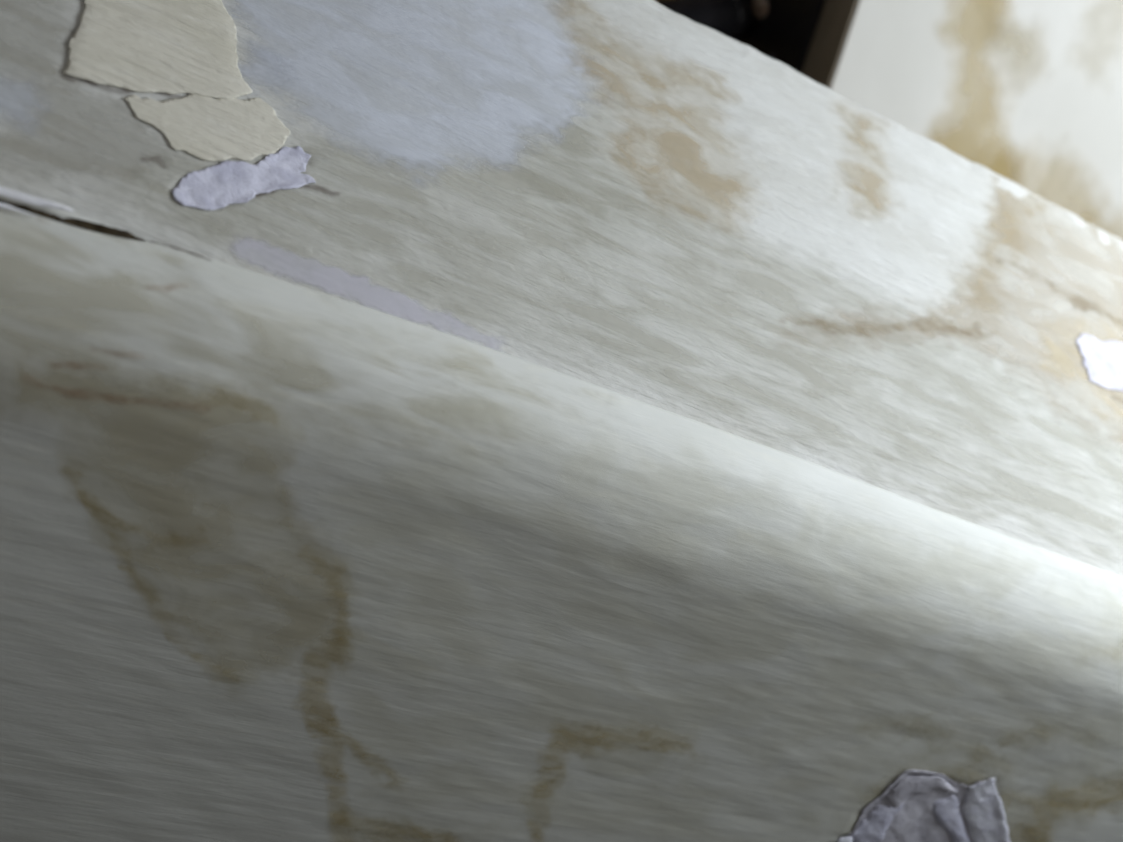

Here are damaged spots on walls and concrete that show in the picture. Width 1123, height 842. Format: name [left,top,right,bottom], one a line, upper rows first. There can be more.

peeling [64,0,597,210]
water stain [648,105,740,200]
water stain [935,90,1010,179]
crack [0,186,192,252]
flaking render [1076,333,1123,391]
flaking render [837,770,1010,842]